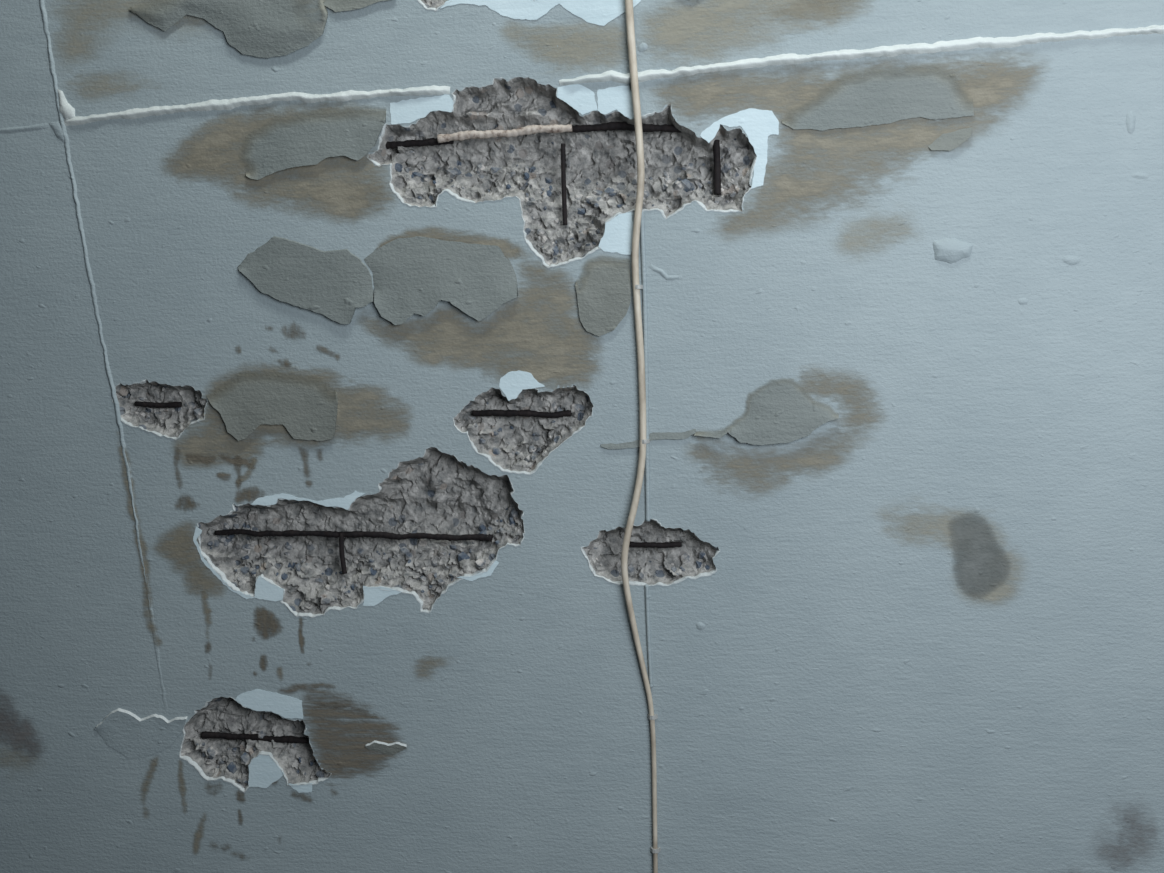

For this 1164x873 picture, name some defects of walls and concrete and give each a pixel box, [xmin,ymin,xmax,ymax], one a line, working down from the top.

spalling [417,0,641,26]
spalling [238,67,974,336]
peeling [112,373,338,441]
spalling [193,370,594,618]
spalling [581,519,720,586]
leakage [953,517,1006,595]
spalling [95,689,330,793]